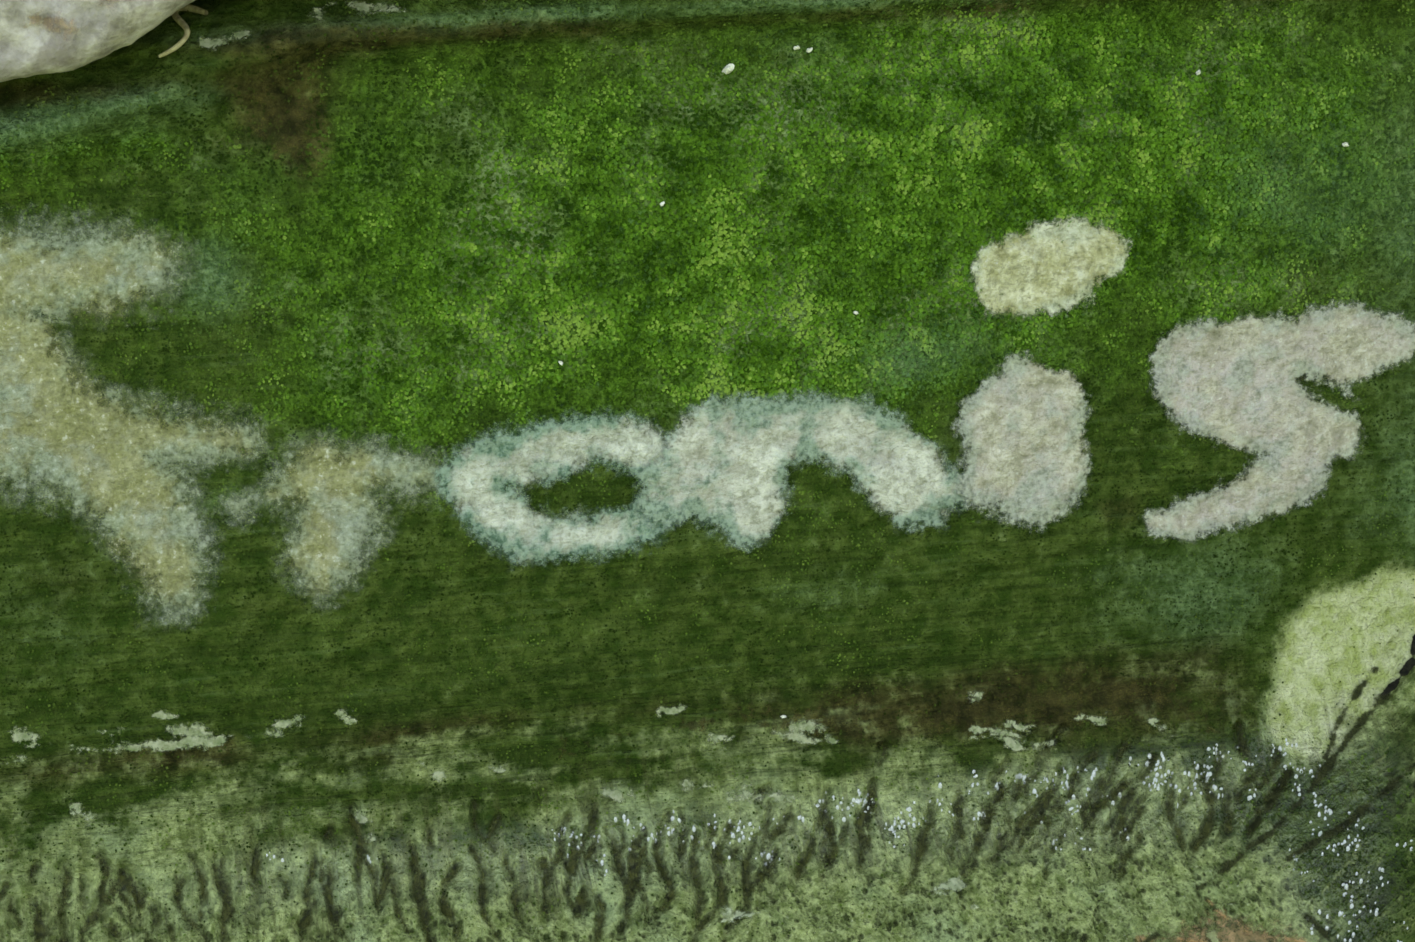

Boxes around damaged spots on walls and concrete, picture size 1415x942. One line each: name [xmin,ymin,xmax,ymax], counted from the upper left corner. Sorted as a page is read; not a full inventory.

damp [0,856,235,942]
damp [250,850,261,882]
damp [282,855,342,942]
damp [348,809,460,942]
damp [469,803,522,941]
damp [539,788,792,941]
damp [795,786,876,892]
damp [900,817,931,894]
damp [924,669,1214,883]
damp [1164,750,1288,853]
crack [1196,634,1415,891]